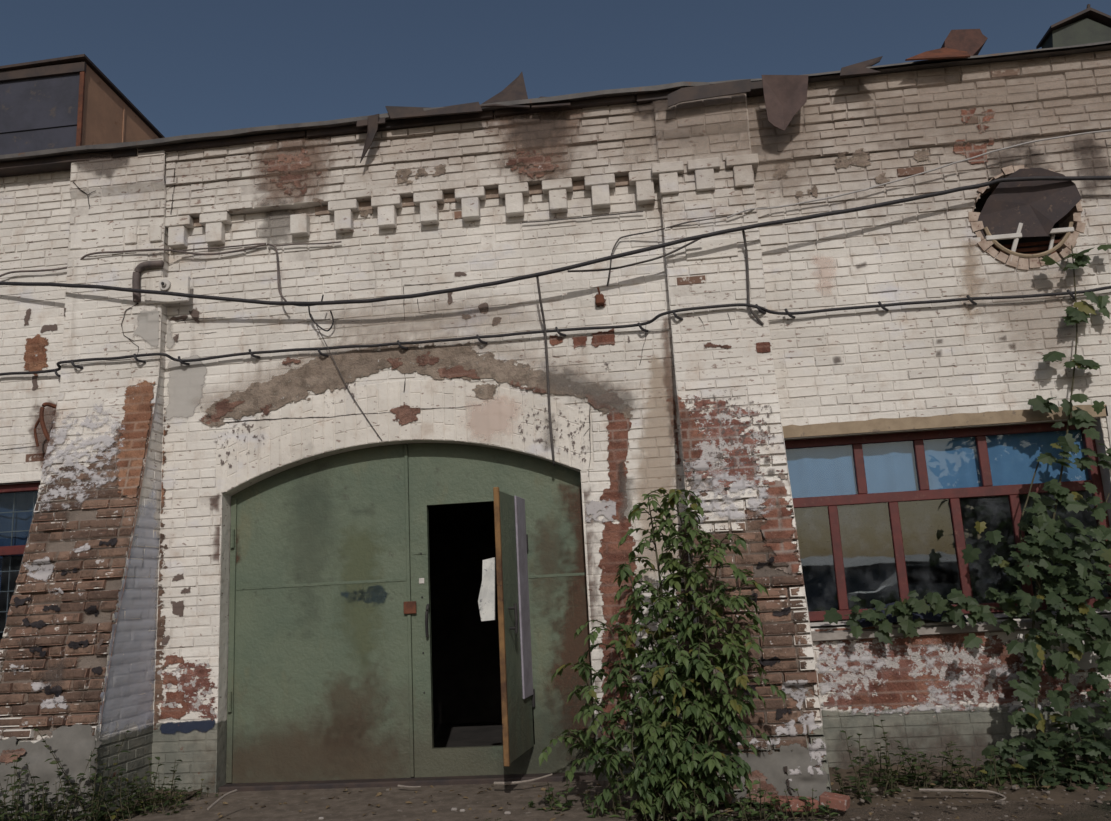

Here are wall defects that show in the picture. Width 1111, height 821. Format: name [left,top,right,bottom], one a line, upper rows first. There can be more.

damp [259,138,327,214]
damp [491,111,582,180]
flaking render [24,308,66,390]
flaking render [549,329,630,349]
corrosion [32,405,57,472]
flaking render [0,380,218,765]
damp [341,585,387,603]
spalling [200,340,638,741]
flaking render [666,389,1111,804]